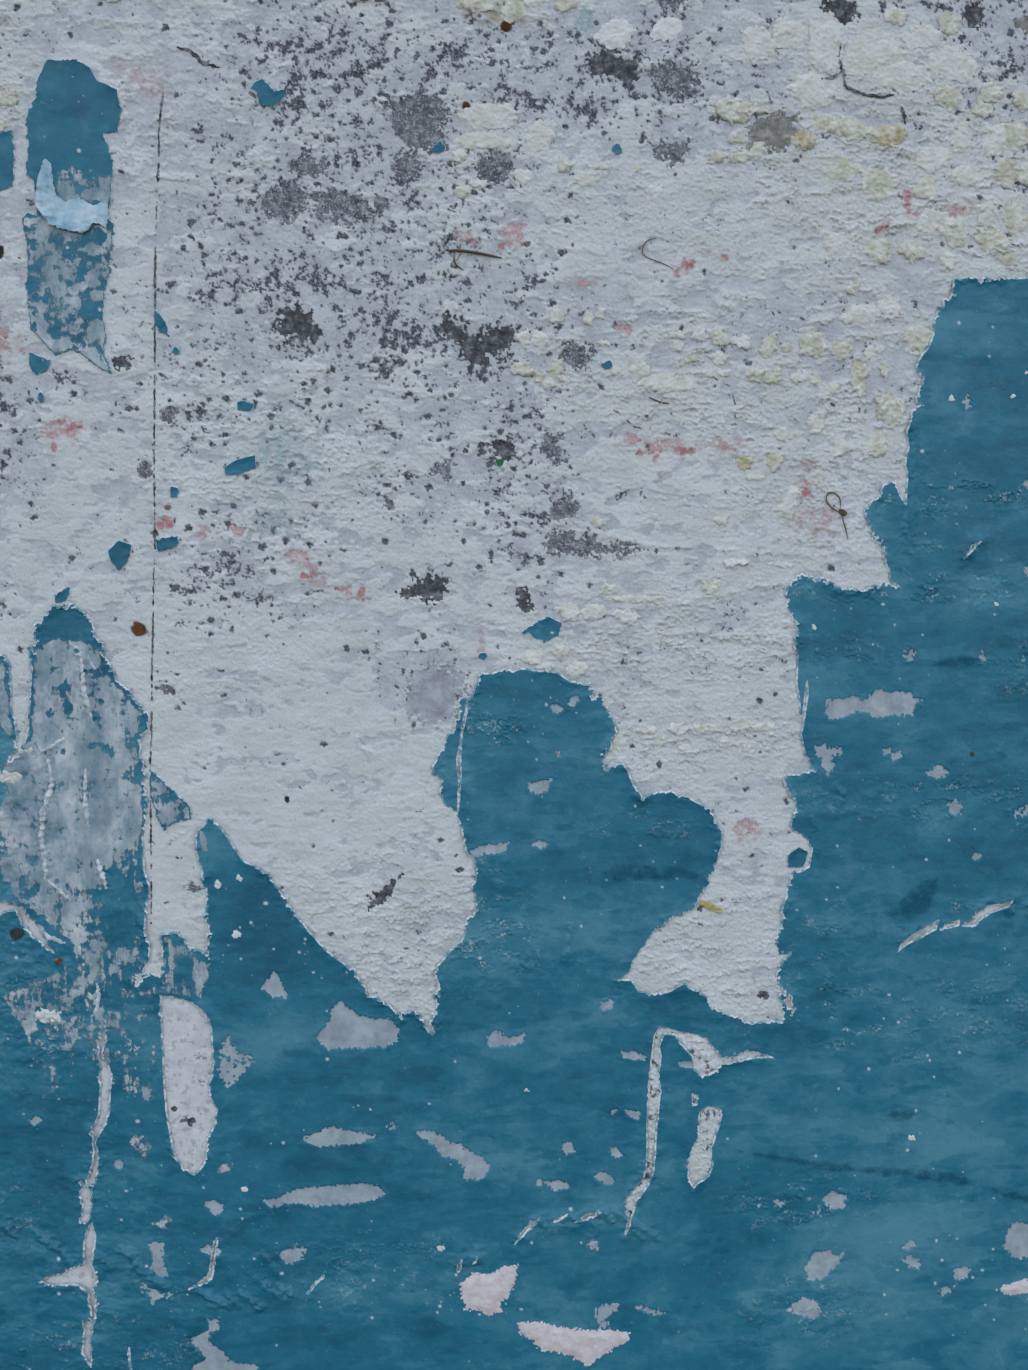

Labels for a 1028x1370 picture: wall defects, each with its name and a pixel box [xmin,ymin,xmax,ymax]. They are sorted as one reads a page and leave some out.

peeling [0,0,1028,1033]
peeling [160,997,256,1173]
peeling [317,1001,400,1051]
peeling [611,1109,640,1120]
peeling [621,1050,647,1061]
peeling [687,1095,721,1186]